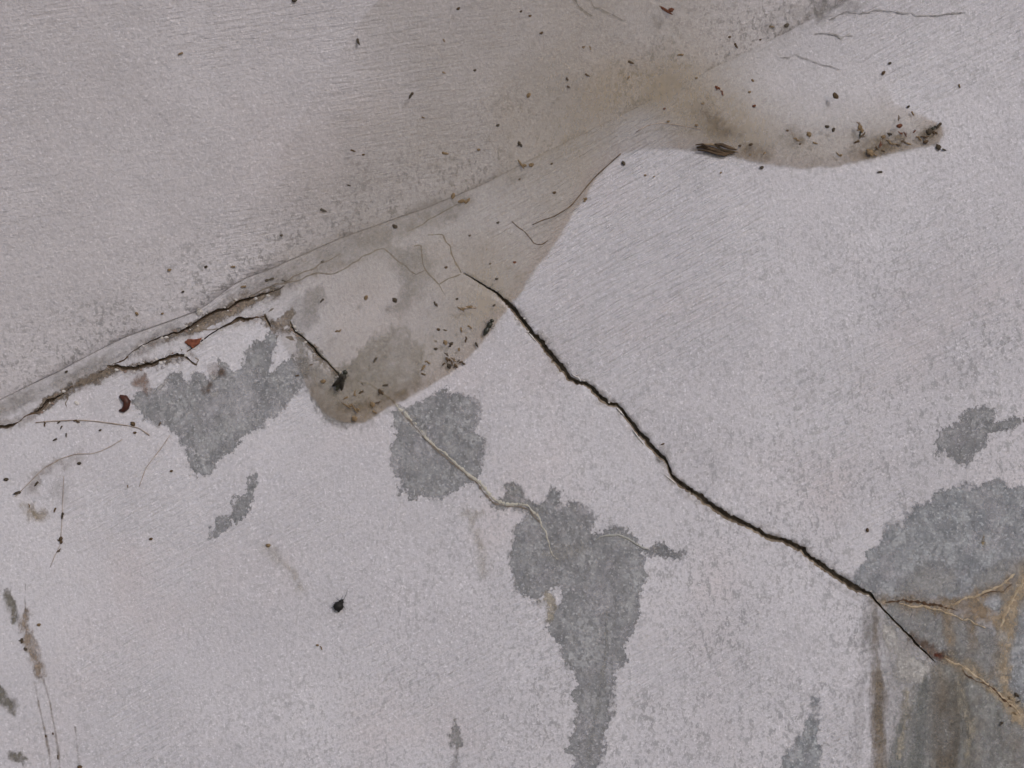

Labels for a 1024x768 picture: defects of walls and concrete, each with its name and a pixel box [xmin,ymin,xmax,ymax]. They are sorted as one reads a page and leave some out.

spalling [184,338,202,348]
crack [0,203,936,663]
leakage [854,477,1024,768]